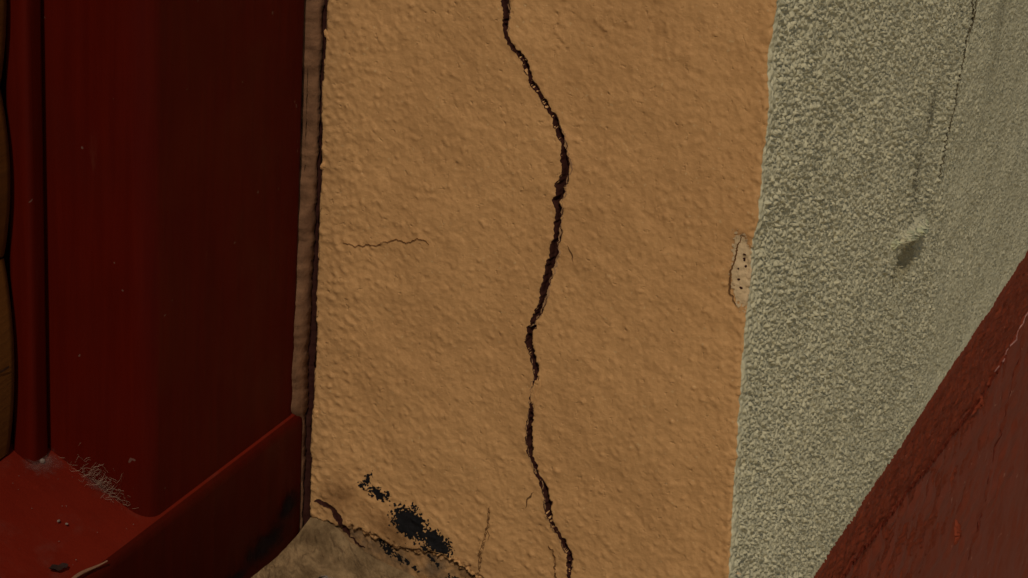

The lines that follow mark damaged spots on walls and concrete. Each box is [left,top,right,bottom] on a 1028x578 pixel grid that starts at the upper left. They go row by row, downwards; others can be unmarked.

crack [501,0,573,578]
flaking render [728,229,753,313]